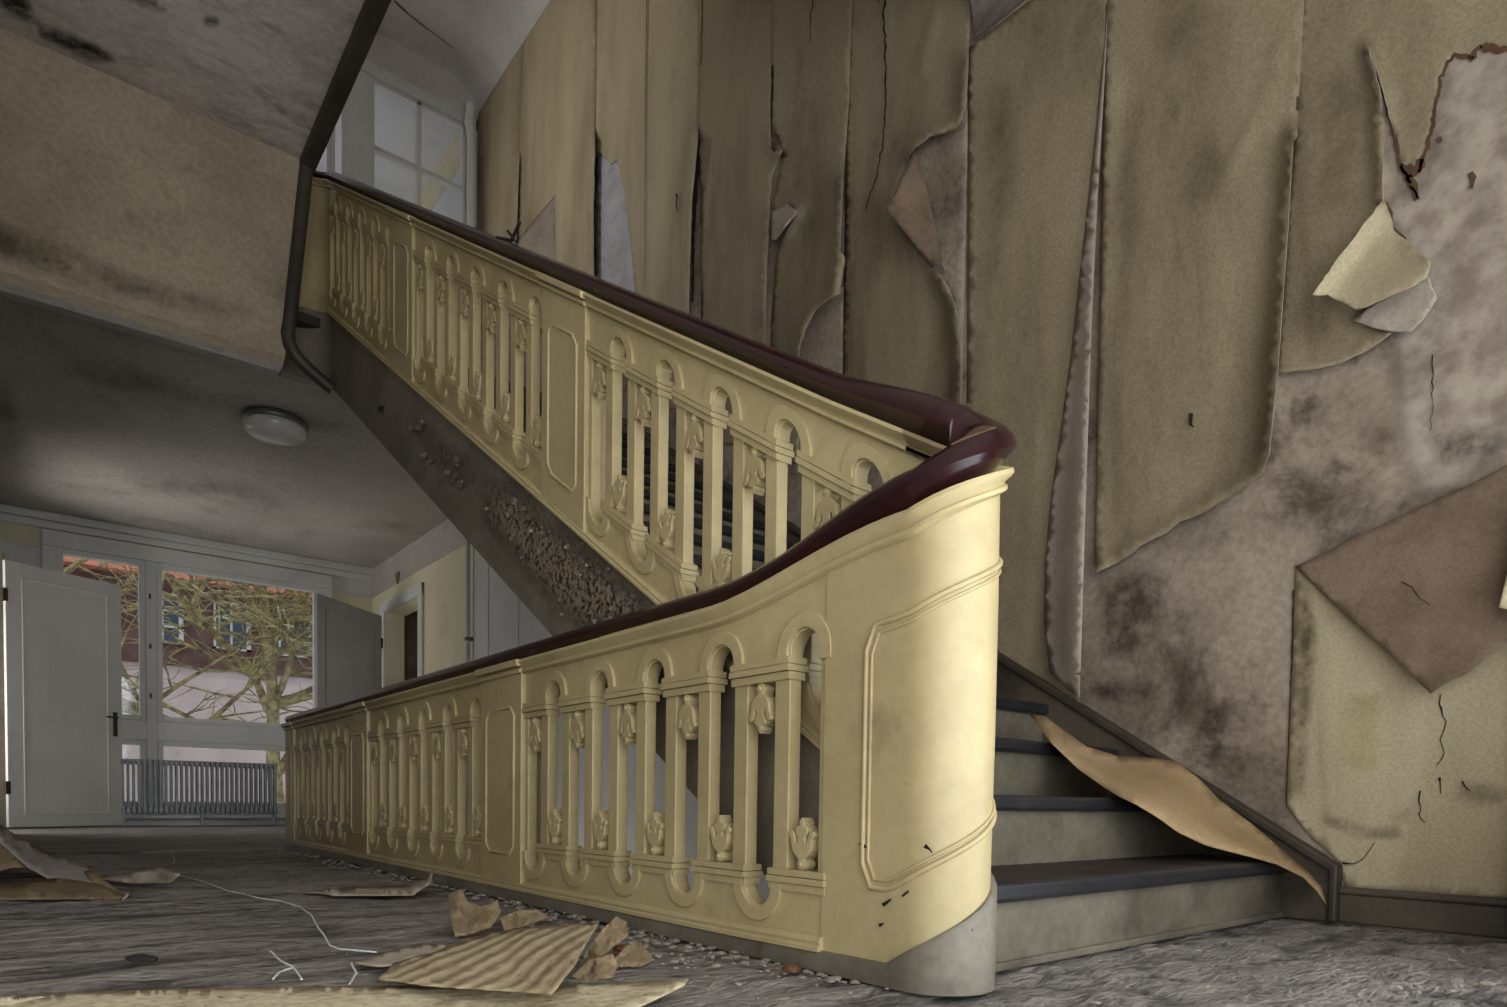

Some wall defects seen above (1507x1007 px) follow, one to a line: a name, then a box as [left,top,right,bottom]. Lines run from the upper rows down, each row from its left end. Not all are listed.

flaking render [595,153,635,292]
flaking render [799,287,844,374]
flaking render [888,103,968,404]
flaking render [1383,42,1507,491]
crack [1418,695,1470,822]